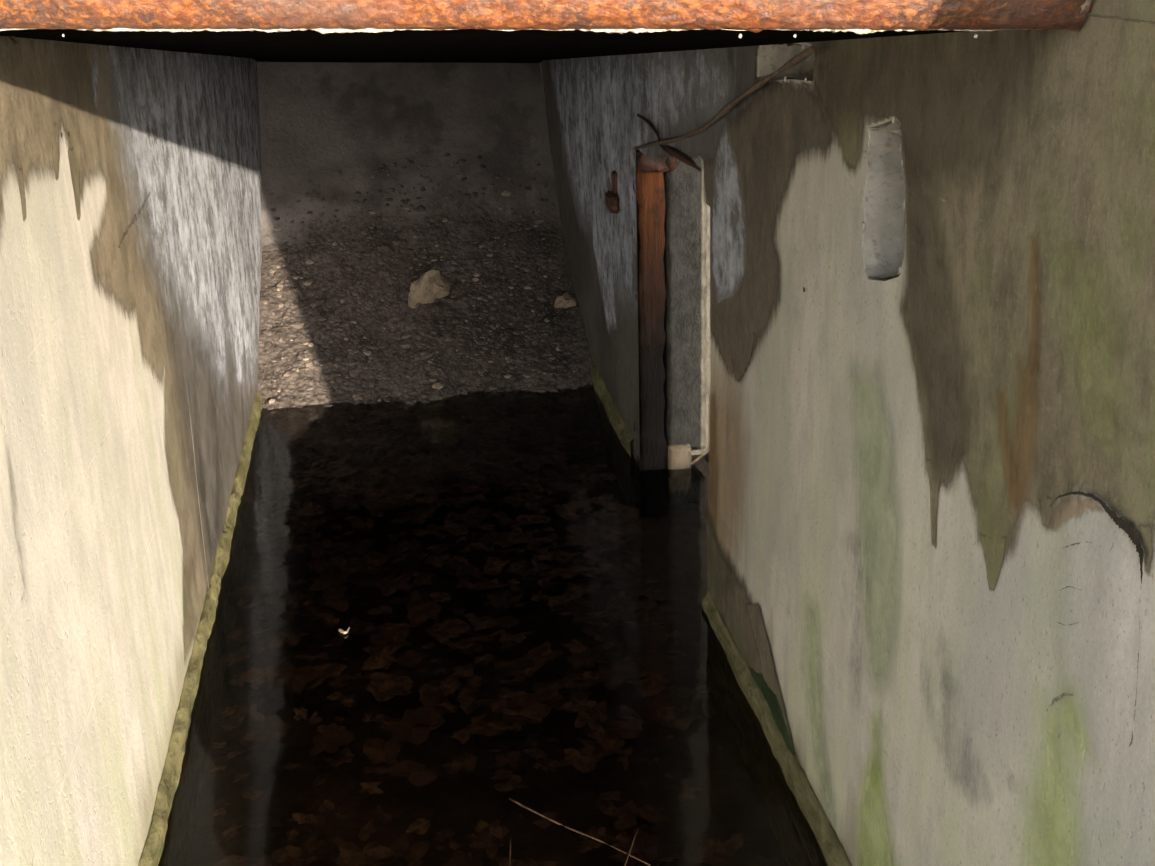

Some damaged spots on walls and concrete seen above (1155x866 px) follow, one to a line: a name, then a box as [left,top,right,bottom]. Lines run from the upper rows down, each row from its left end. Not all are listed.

damp [0,28,459,660]
damp [541,0,1155,590]
crack [1049,491,1144,602]